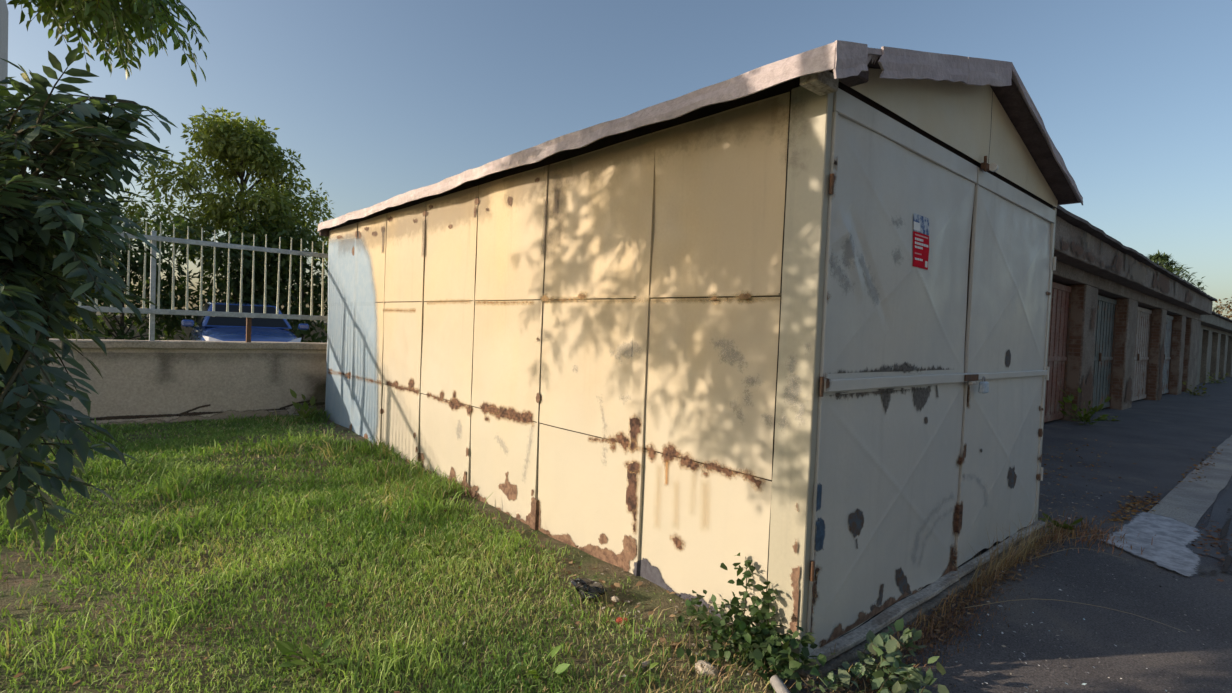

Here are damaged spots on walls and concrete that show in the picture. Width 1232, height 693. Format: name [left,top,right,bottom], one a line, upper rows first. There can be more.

rust [328,369,532,424]
rust [589,417,762,532]
peeling [1008,467,1017,488]
peeling [405,432,727,622]
peeling [815,483,825,551]
peeling [849,508,864,548]
rust [942,504,963,576]
peeling [788,540,800,633]
rust [810,552,923,647]
peeling [871,568,911,611]